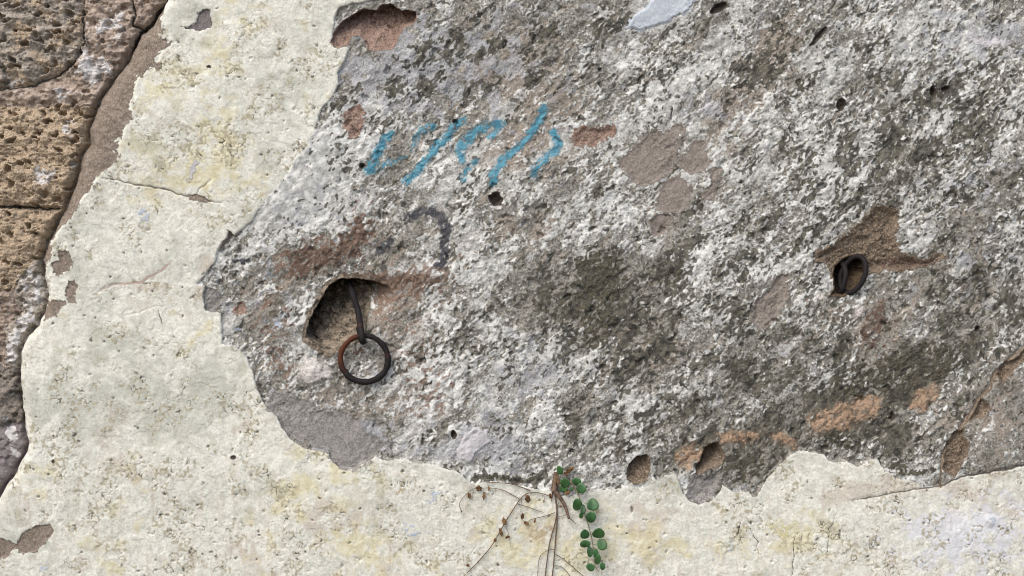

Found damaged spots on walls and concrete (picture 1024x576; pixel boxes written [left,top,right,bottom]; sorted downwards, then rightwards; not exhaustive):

crack [103,178,219,203]
flaking render [189,0,1024,505]
flaking render [0,524,54,559]
crack [826,347,1024,554]